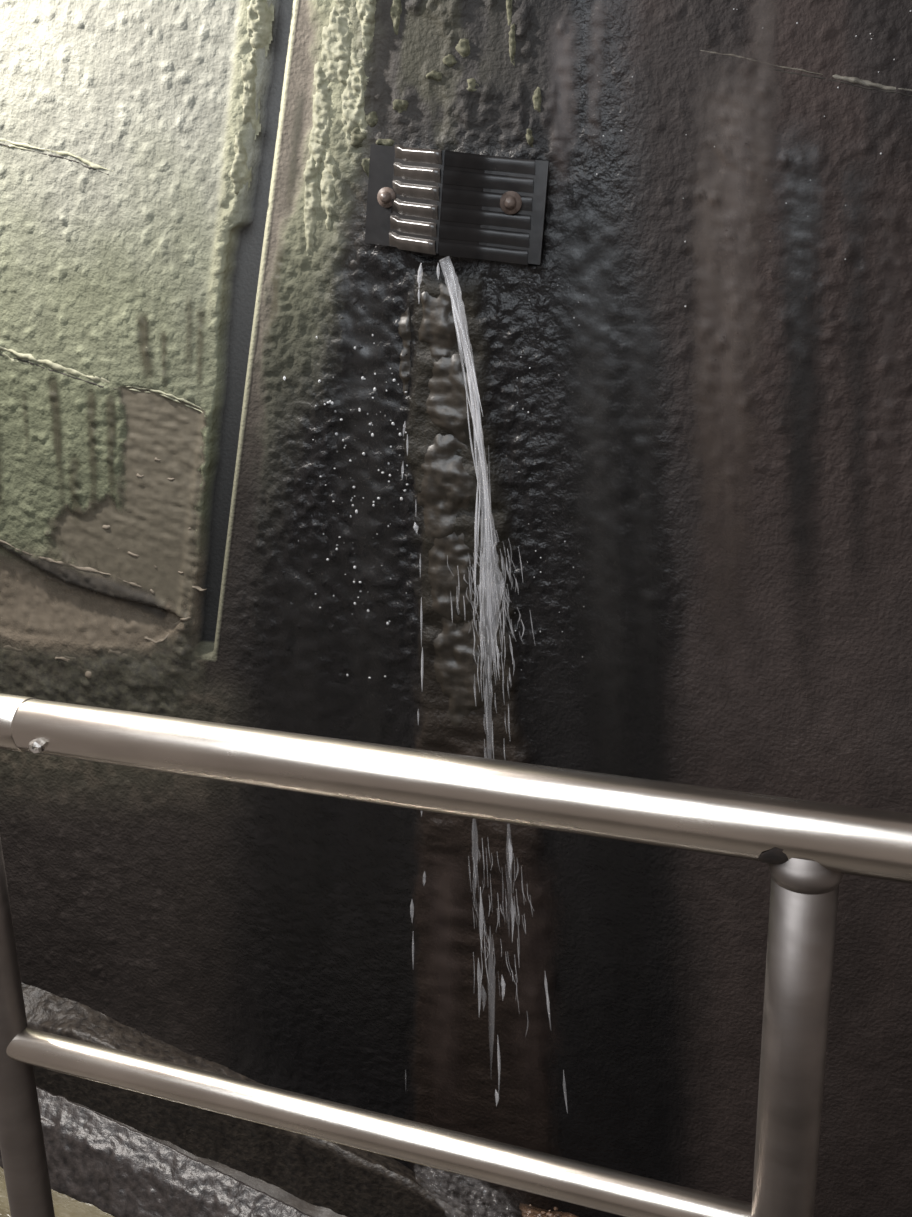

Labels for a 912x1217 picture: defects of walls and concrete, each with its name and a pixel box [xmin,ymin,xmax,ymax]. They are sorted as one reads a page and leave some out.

crack [0,138,113,175]
leakage [290,0,376,256]
crack [700,50,912,97]
peeling [0,386,207,716]